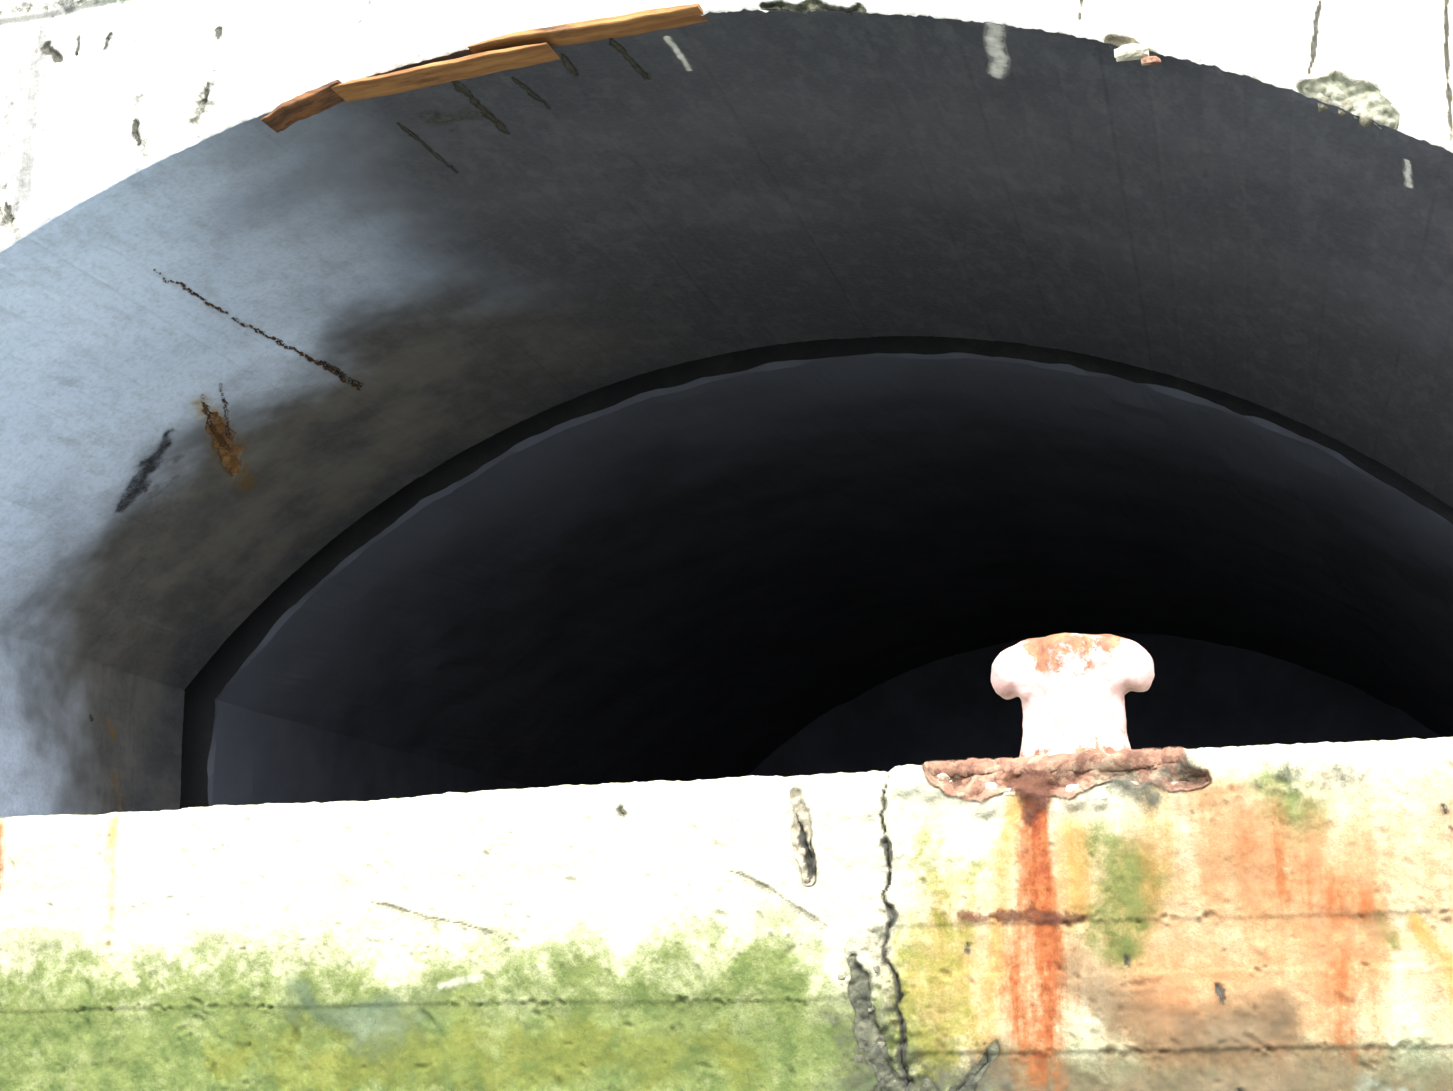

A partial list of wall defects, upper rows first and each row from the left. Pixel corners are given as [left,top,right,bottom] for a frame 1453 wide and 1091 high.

crack [1444,0,1453,140]
spalling [1297,71,1399,129]
crack [153,269,361,389]
rust [962,793,1083,989]
crack [874,774,913,1091]
damp [323,1000,400,1040]
rust [1201,1016,1278,1048]
crack [957,1043,989,1091]
damp [1181,1059,1322,1091]